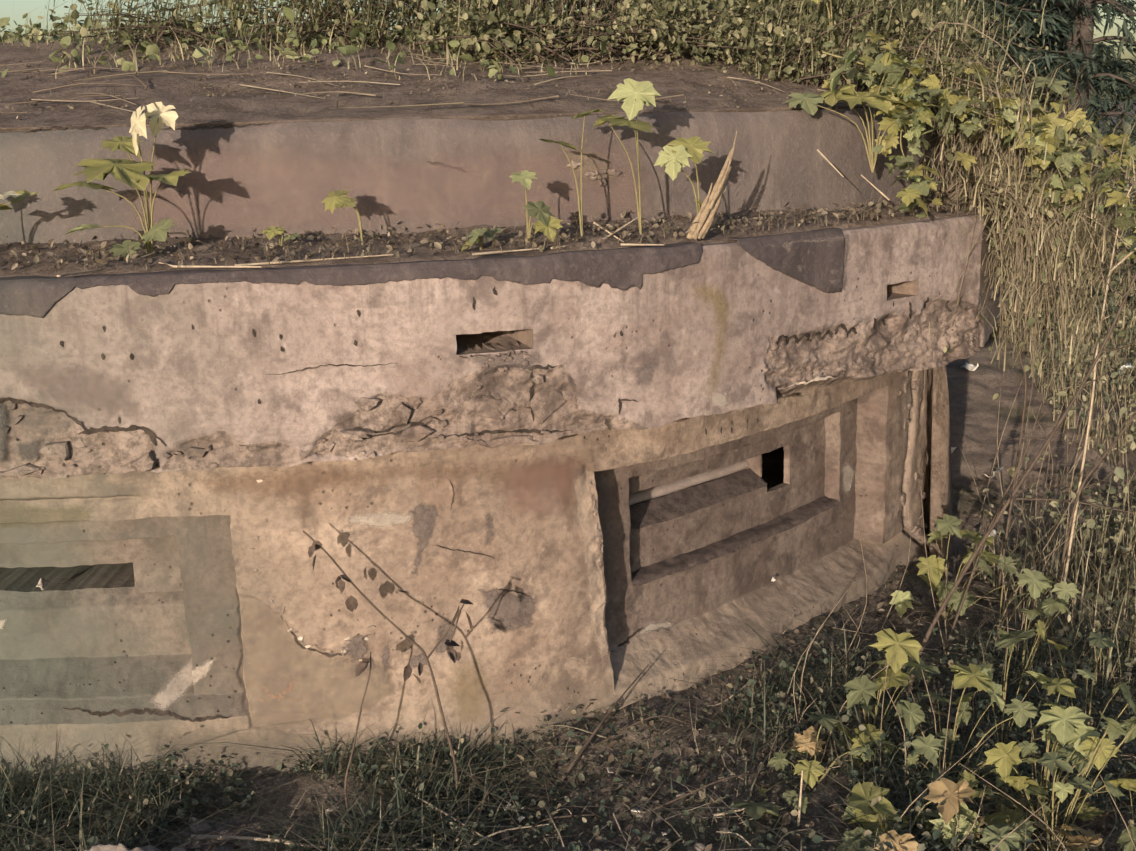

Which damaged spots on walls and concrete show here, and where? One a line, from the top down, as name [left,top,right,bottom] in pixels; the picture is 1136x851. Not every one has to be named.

spalling [0,340,650,479]
spalling [764,297,983,542]
crack [63,707,232,722]